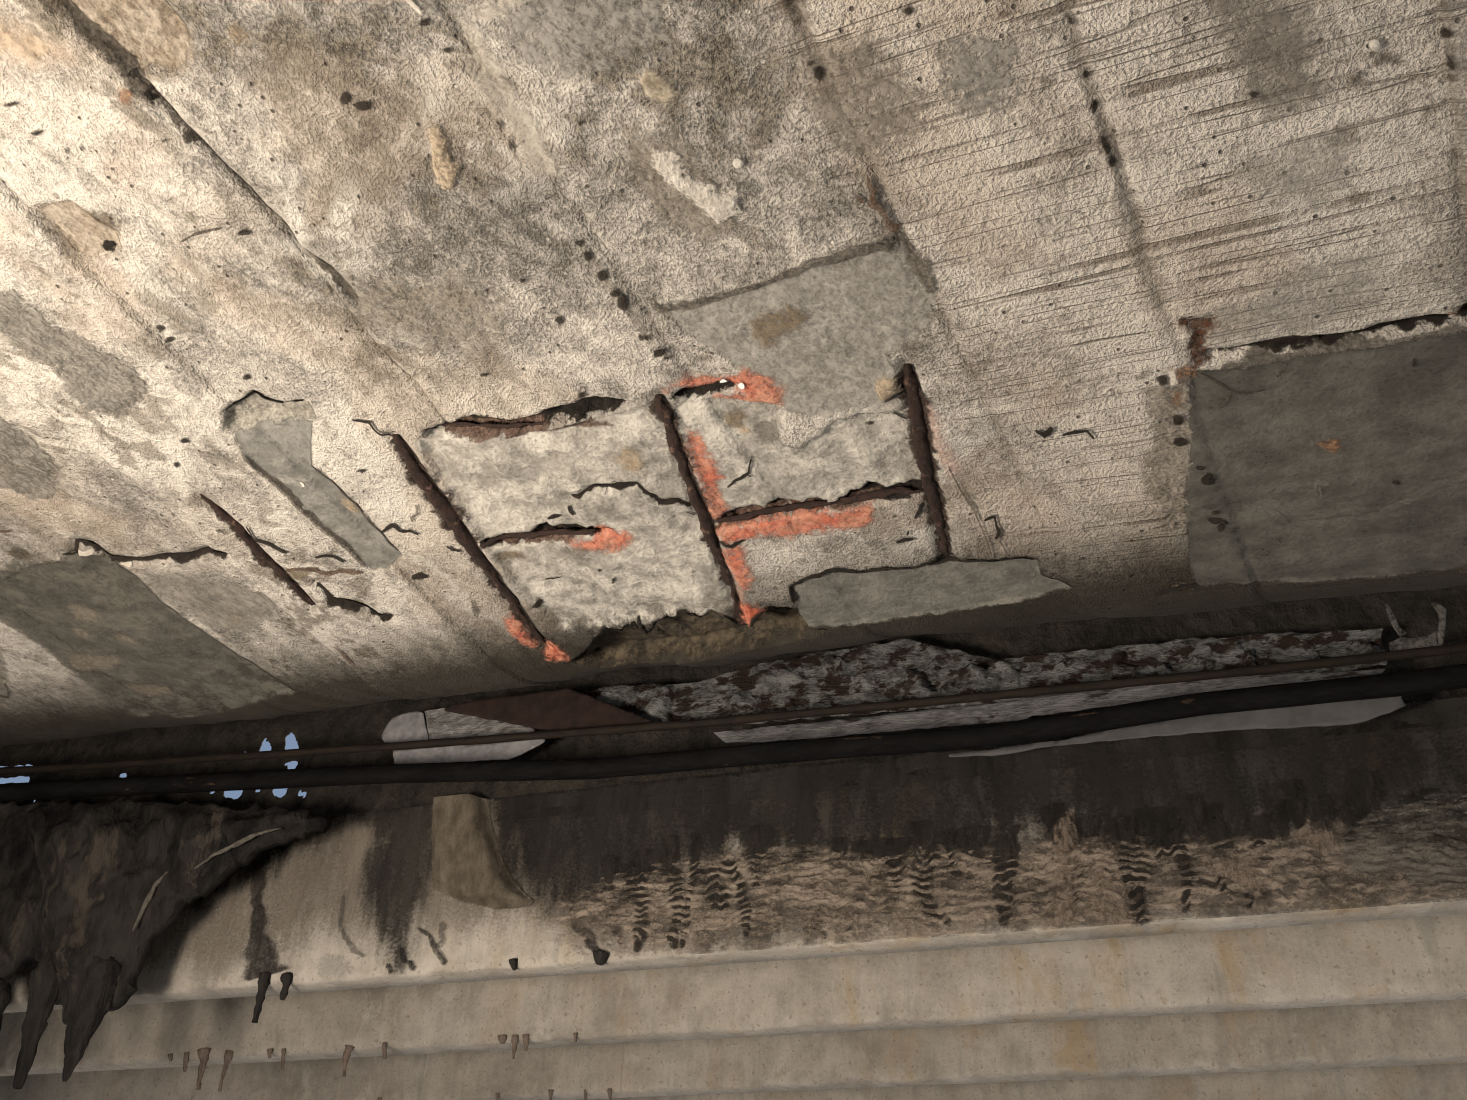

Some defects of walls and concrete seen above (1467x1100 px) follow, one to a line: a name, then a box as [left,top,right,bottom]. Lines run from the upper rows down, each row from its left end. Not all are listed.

crack [61,0,358,299]
crack [63,527,392,622]
crack [381,505,460,580]
corrosion [391,434,633,661]
corrosion [441,414,613,443]
spalling [417,389,919,665]
corrosion [655,363,955,627]
crack [1200,303,1467,395]
crack [334,647,356,668]
leakage [551,793,1467,953]